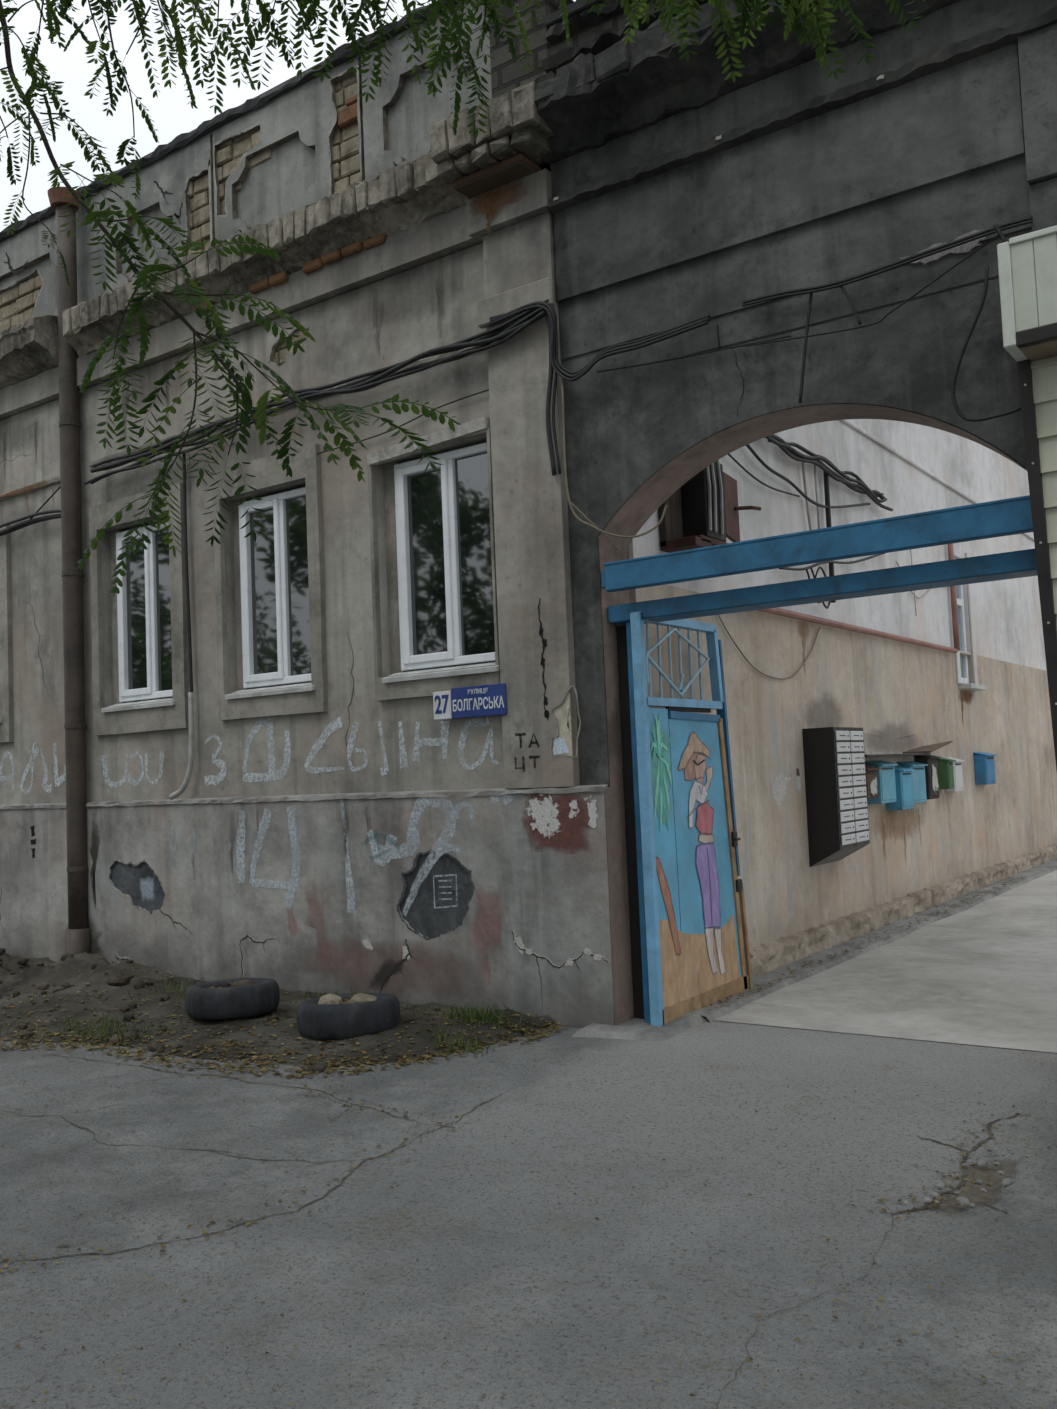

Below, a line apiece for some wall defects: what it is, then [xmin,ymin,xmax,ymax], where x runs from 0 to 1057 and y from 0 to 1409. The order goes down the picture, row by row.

flaking render [327,65,363,195]
flaking render [183,123,272,256]
corrosion [473,183,520,233]
flaking render [0,268,44,332]
crack [538,598,549,720]
peeling [550,684,581,758]
peeling [525,794,598,850]
spalling [108,859,166,917]
spalling [396,849,475,960]
crack [512,929,610,1010]
crack [0,1051,503,1262]
crack [717,1113,1020,1409]